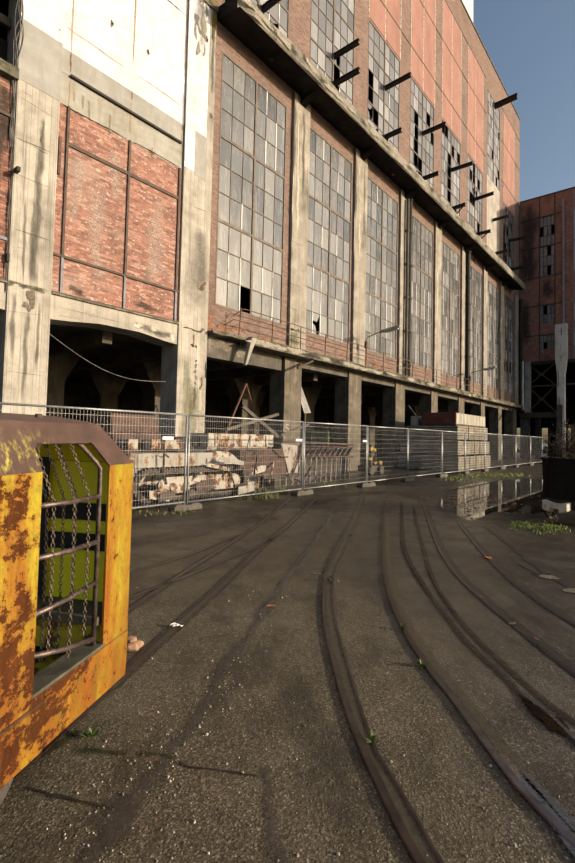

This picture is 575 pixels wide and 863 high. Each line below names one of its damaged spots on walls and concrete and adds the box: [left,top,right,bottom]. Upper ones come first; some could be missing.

peeling [194,0,209,56]
damp [23,125,44,274]